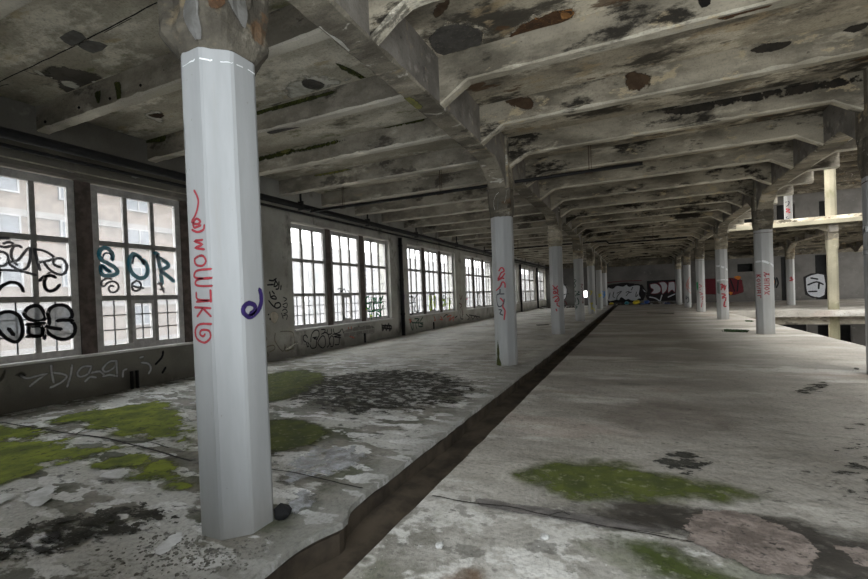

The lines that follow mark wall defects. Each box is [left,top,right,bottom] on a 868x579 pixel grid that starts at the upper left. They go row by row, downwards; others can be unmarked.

spalling [183,0,248,40]
spalling [287,75,351,98]
rust [625,71,652,91]